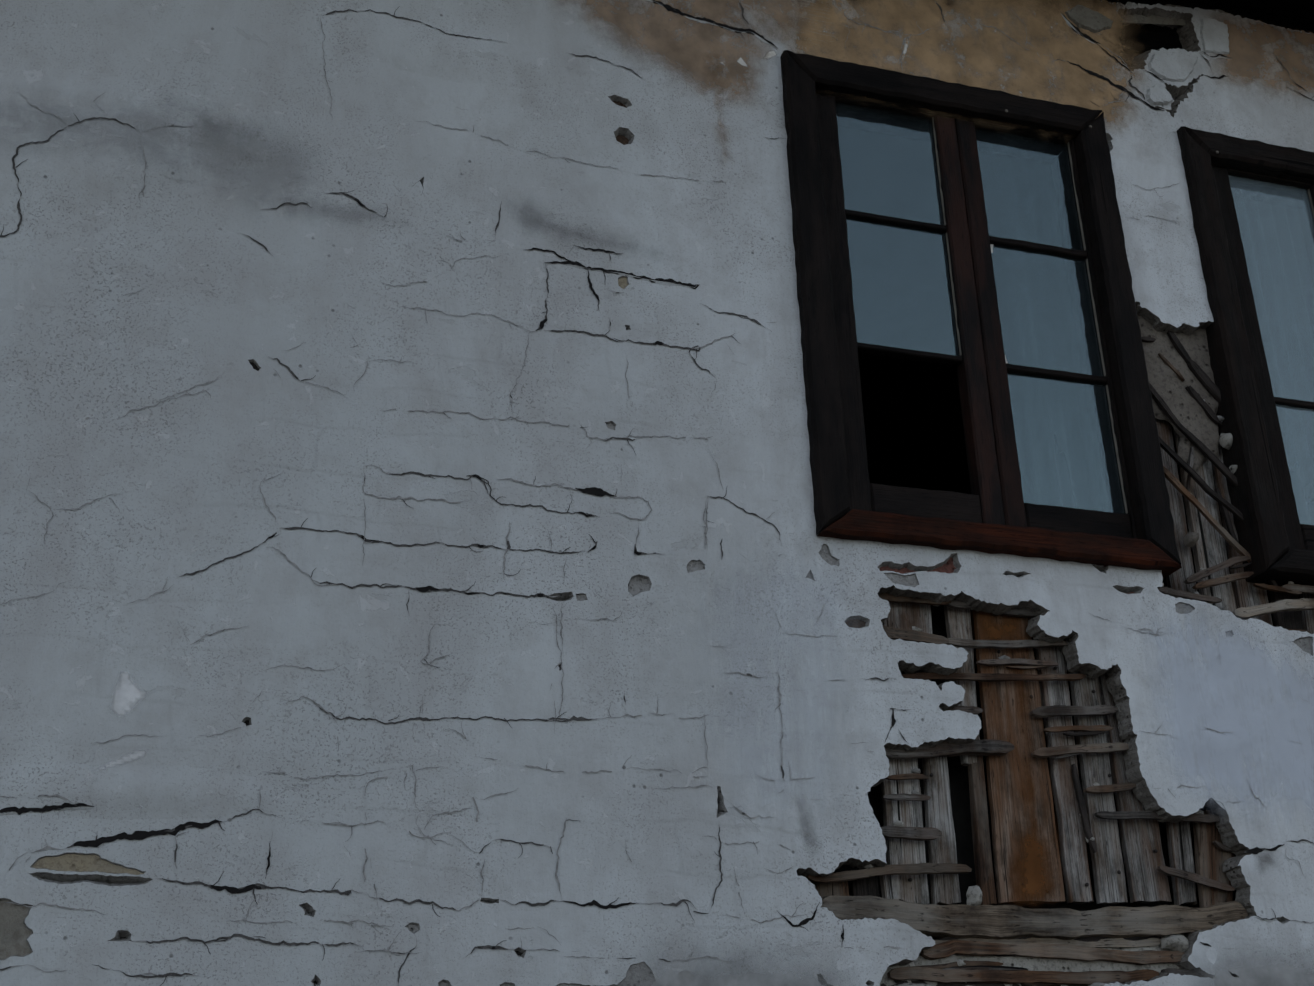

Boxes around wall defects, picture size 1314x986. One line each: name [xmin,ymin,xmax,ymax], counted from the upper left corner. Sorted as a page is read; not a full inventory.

crack [320,6,503,117]
water stain [585,0,801,95]
crack [645,0,778,50]
crack [1054,13,1172,111]
peeling [1146,18,1229,106]
crack [0,92,201,237]
crack [241,190,388,254]
spalling [1137,315,1314,655]
crack [0,202,911,986]
spalling [806,557,1248,986]
peeling [32,854,144,884]
peeling [0,900,32,960]